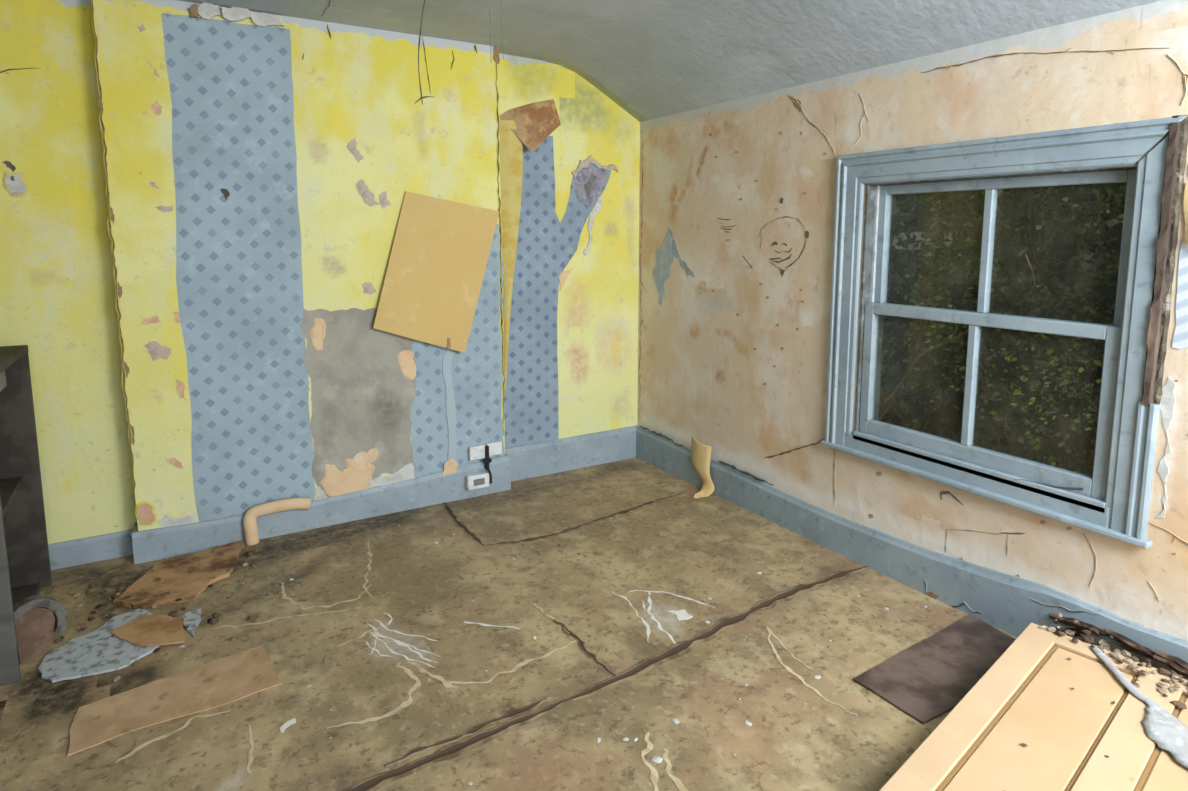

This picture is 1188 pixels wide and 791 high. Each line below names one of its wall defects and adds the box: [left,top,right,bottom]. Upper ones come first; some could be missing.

crack [321,0,332,39]
crack [921,48,1188,105]
peeling [2,161,29,198]
peeling [302,133,364,174]
peeling [355,180,391,209]
peeling [653,228,745,334]
flaking render [300,249,416,500]
peeling [1153,350,1188,519]
crack [443,491,687,546]
crack [1150,522,1188,546]
crack [255,550,888,791]